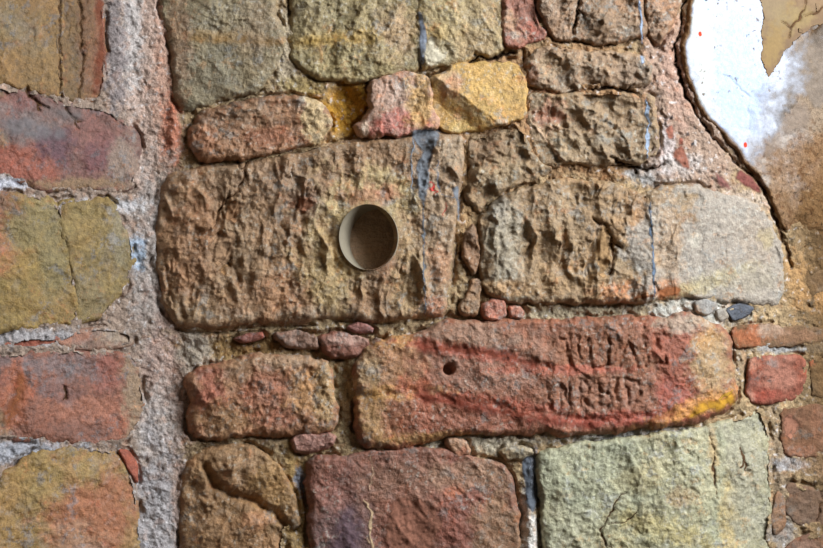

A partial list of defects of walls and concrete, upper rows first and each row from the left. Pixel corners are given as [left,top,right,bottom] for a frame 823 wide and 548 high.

peeling [686,0,823,160]
crack [599,494,638,548]